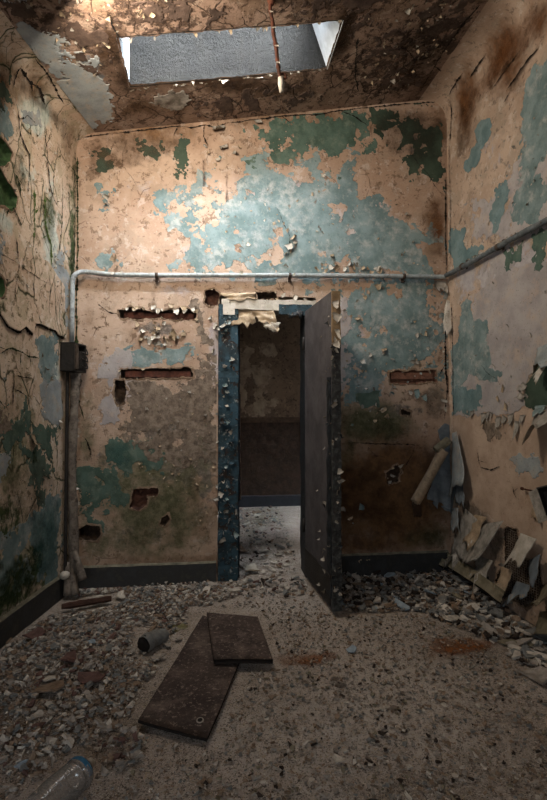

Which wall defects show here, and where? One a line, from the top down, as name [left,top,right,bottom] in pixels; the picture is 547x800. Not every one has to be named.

peeling [404,0,480,64]
crack [494,50,537,102]
peeling [89,147,116,212]
crack [0,6,486,416]
peeling [93,248,123,275]
peeling [130,60,547,685]
peeling [75,287,279,543]